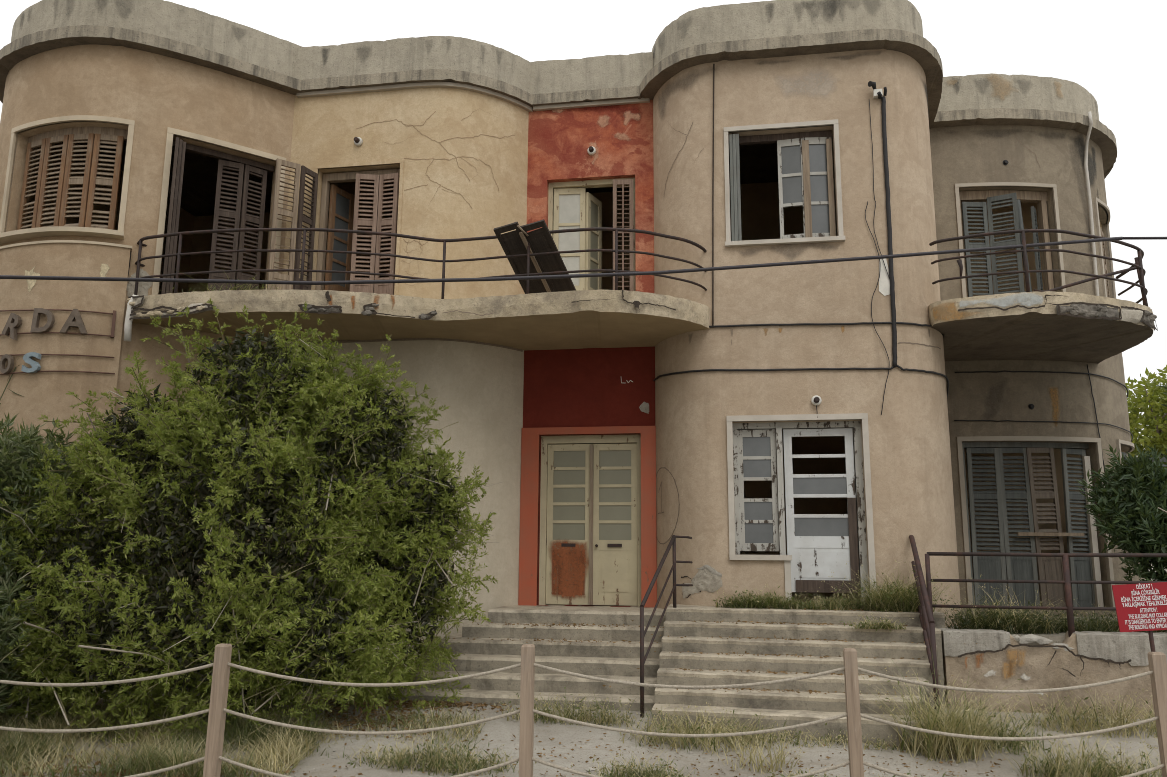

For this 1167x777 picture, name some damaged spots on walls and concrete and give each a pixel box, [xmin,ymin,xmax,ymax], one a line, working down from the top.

crack [356,108,512,212]
spalling [126,269,217,320]
spalling [298,304,342,314]
spalling [361,303,379,316]
spalling [419,310,437,320]
spalling [1056,302,1122,321]
spalling [1140,310,1158,331]
crack [958,644,1131,677]